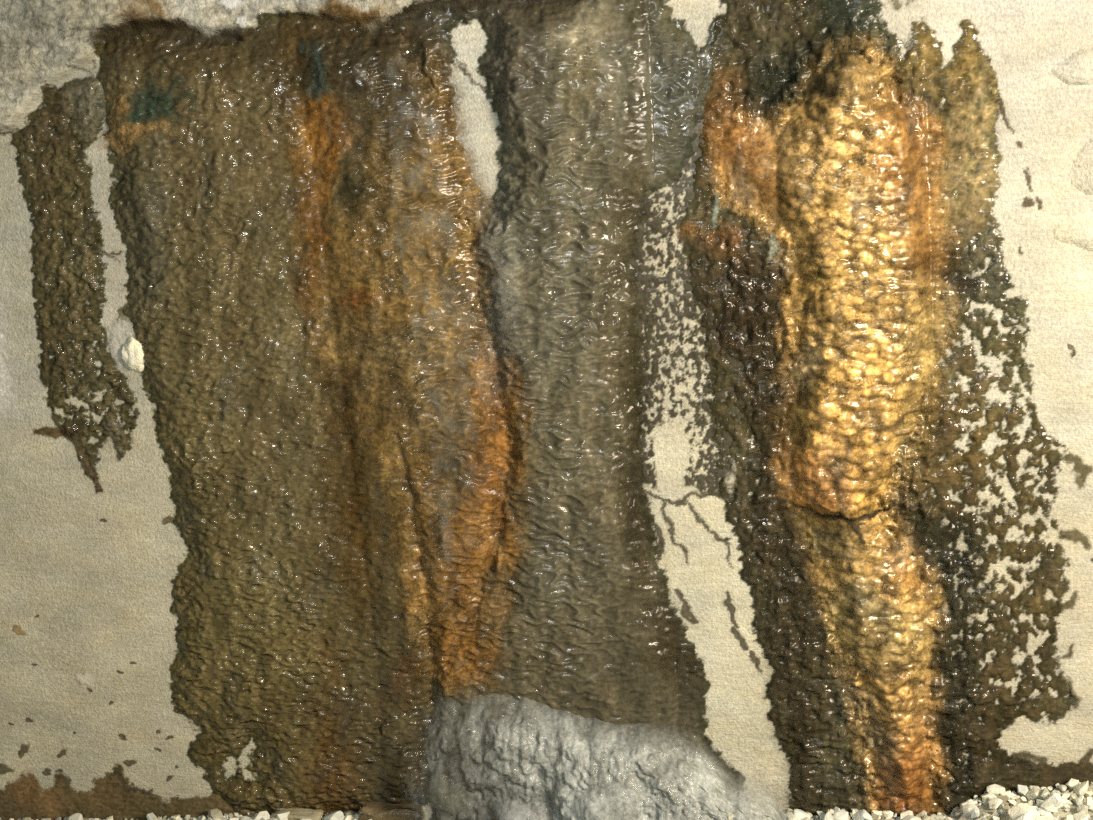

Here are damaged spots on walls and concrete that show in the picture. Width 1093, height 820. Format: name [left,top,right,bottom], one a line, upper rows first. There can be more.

leakage [800,137,822,205]
leakage [839,117,871,170]
corrosion [279,0,532,693]
leakage [898,320,918,383]
leakage [347,366,419,425]
corrosion [707,34,956,816]
leakage [1051,520,1091,550]
crack [644,490,937,672]